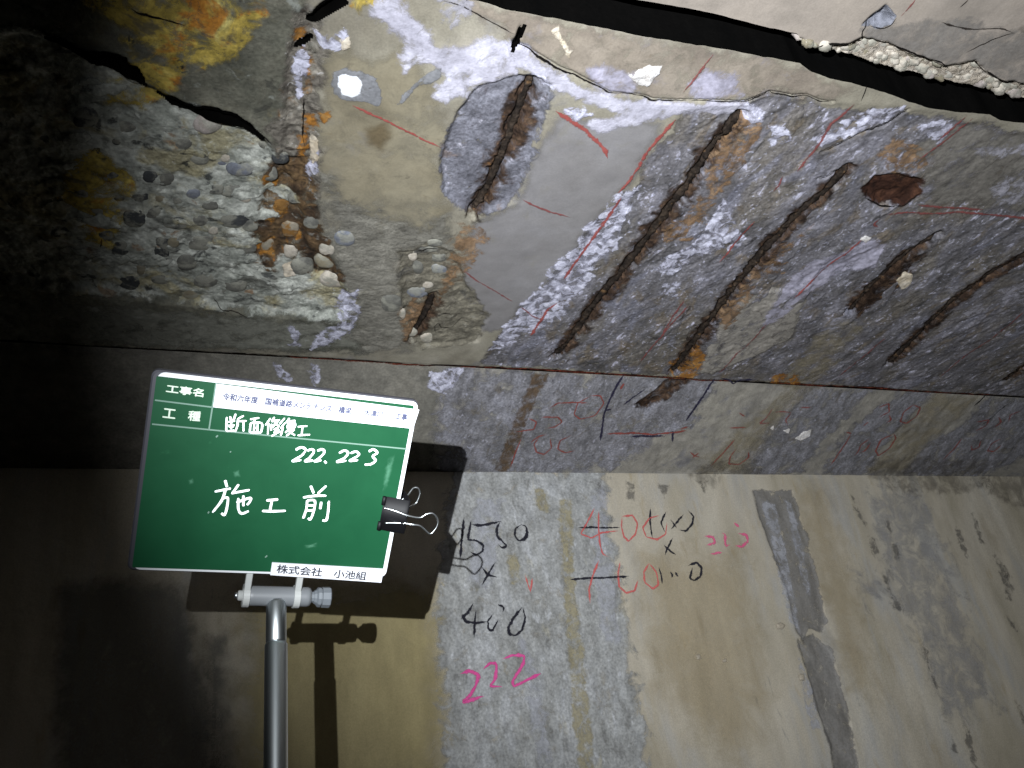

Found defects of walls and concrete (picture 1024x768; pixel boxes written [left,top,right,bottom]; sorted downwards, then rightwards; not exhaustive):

crack [44,36,272,145]
spalling [0,6,357,324]
rust [252,111,355,287]
water stain [0,0,845,354]
spalling [381,239,491,350]
rust [399,74,539,343]
spalling [438,74,554,216]
crack [446,0,831,102]
rust [447,162,858,471]
rust [553,109,762,354]
peeling [481,91,1024,396]
crack [816,7,947,66]